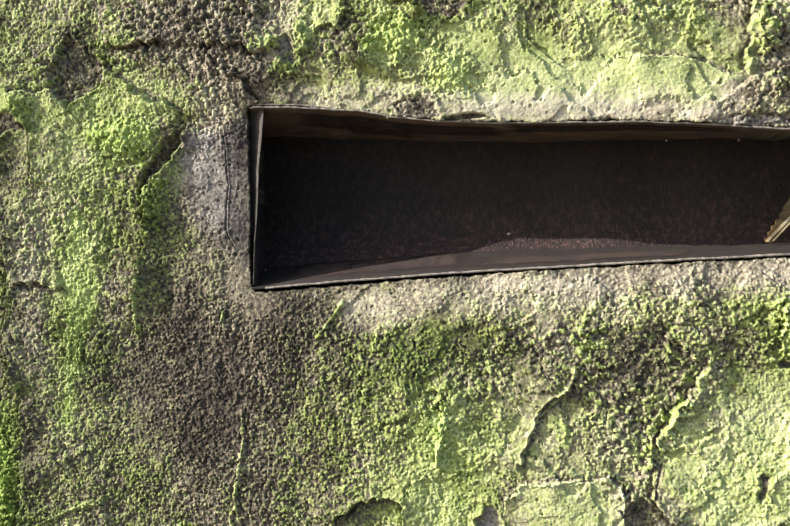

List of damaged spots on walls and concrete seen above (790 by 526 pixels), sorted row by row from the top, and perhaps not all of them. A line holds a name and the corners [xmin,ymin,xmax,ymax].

crack [215,126,245,256]
flaking render [304,359,741,526]
spalling [753,471,777,508]
spalling [767,516,790,526]